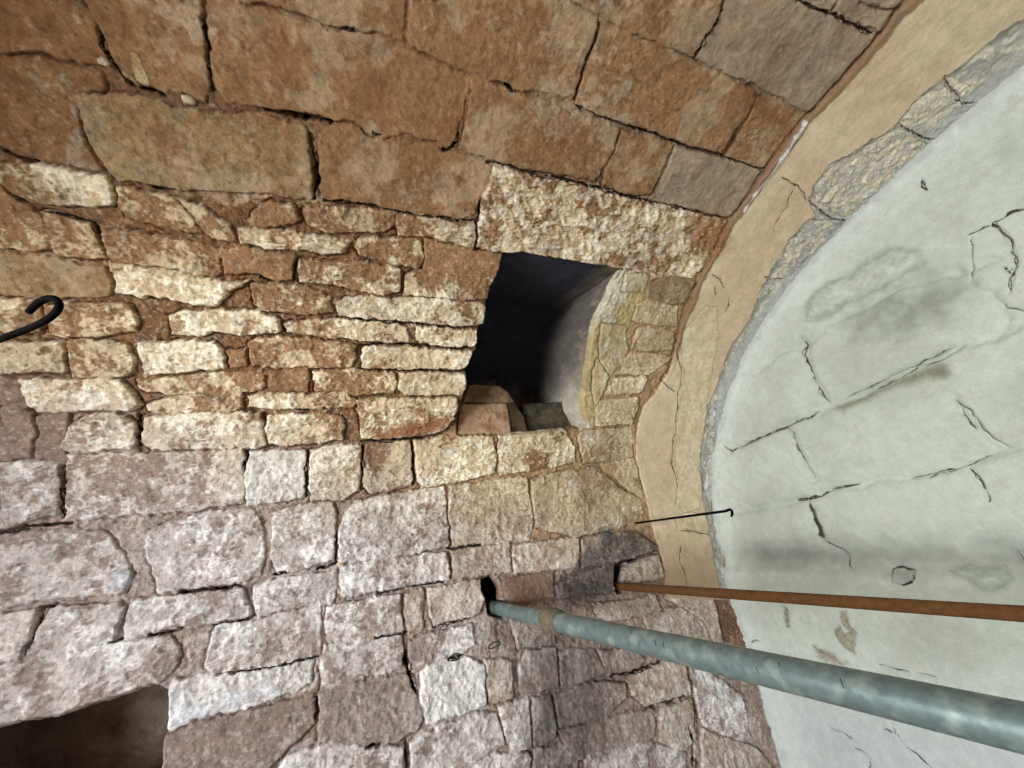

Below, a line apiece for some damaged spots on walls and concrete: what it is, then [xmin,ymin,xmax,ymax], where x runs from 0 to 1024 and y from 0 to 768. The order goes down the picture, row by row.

crack [775,177,845,223]
crack [968,209,1024,311]
flaking render [675,76,970,579]
crack [723,338,962,567]
crack [914,400,1006,502]
flaking render [890,566,916,586]
flaking render [835,612,856,652]